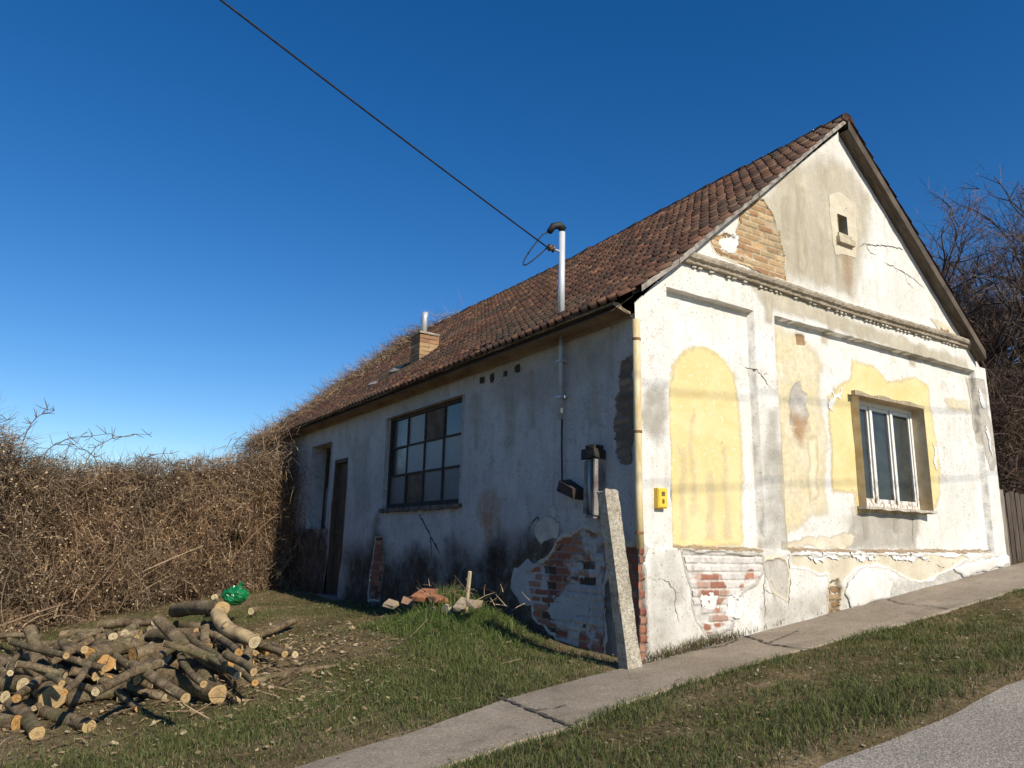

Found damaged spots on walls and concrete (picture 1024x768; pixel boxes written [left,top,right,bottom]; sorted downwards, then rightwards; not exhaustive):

flaking render [710,195,788,282]
crack [861,243,917,289]
spalling [610,350,634,470]
spalling [789,381,809,437]
flaking render [367,535,437,612]
crack [419,515,441,556]
leakage [345,536,612,651]
flaking render [528,503,609,654]
flaking render [625,542,651,662]
flaking render [673,545,989,636]